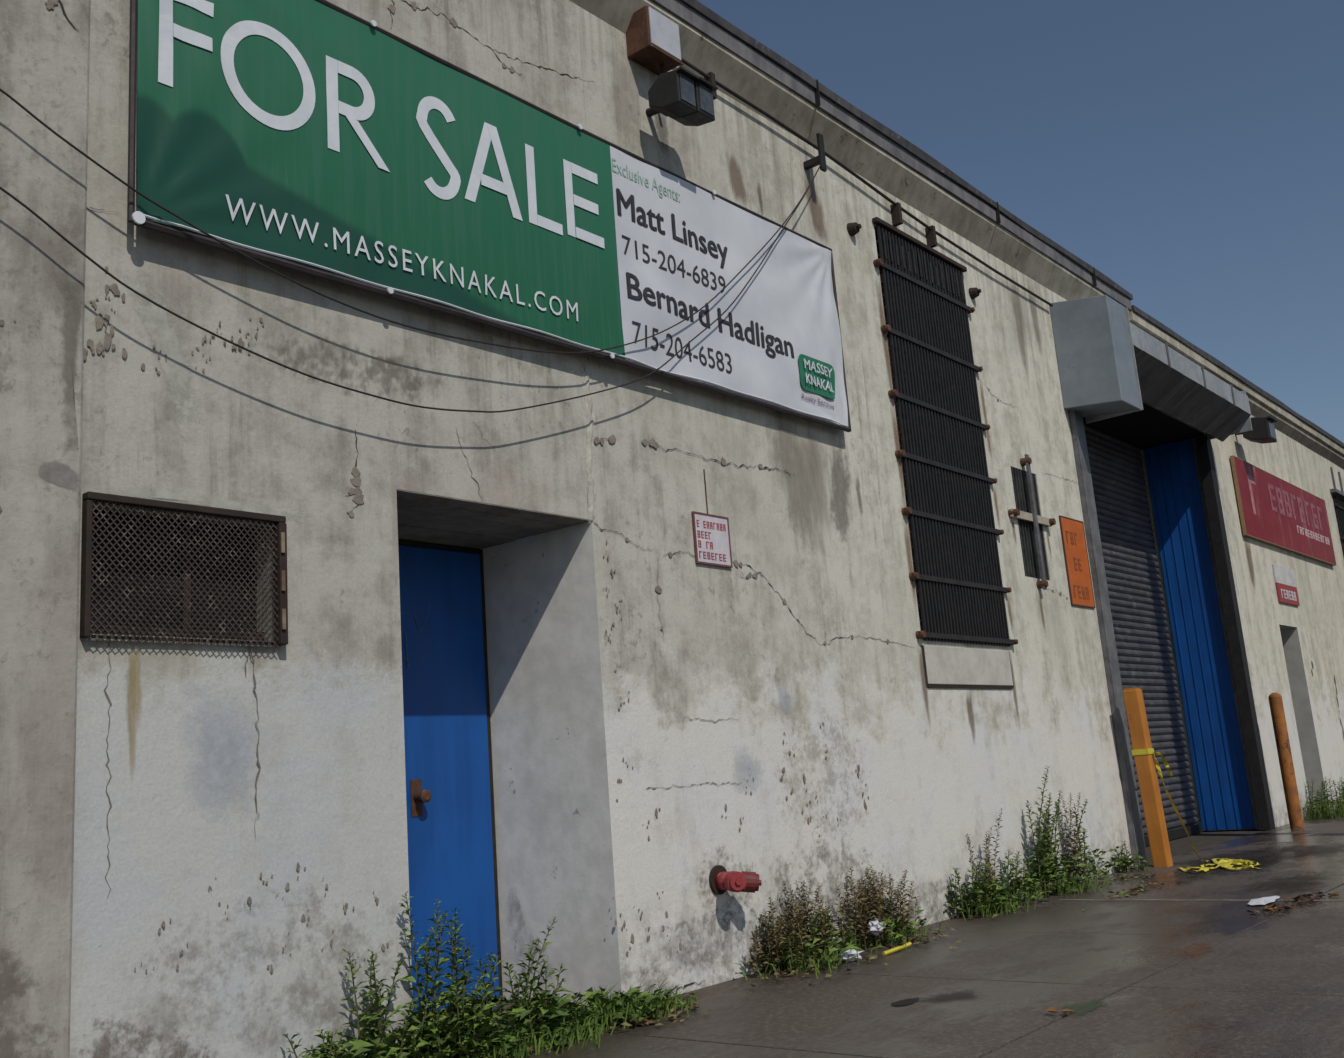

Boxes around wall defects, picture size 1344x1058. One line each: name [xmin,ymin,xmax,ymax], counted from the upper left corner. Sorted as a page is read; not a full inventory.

crack [45,0,78,30]
crack [387,0,594,82]
peeling [83,266,128,361]
peeling [191,317,264,373]
crack [594,435,795,475]
crack [594,522,695,639]
crack [734,560,907,646]
crack [104,643,112,898]
corrosion [129,660,139,754]
crack [245,646,261,837]